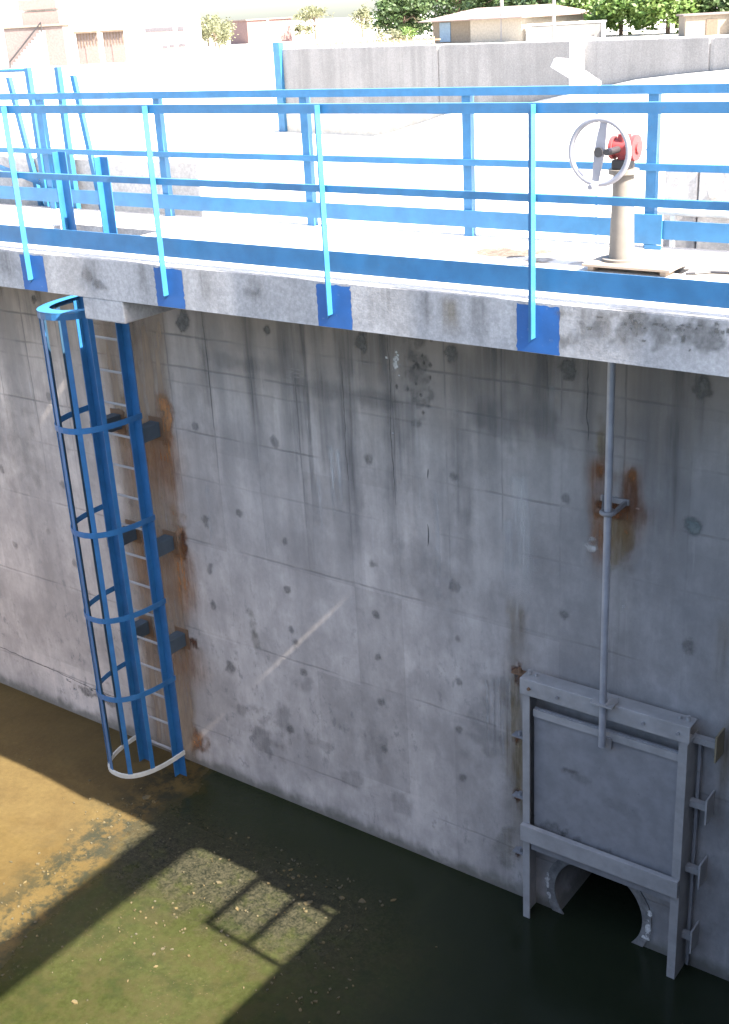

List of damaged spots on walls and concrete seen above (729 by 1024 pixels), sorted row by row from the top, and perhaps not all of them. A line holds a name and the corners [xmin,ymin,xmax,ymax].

rust [105,322,127,413]
rust [118,317,210,755]
rust [593,470,643,548]